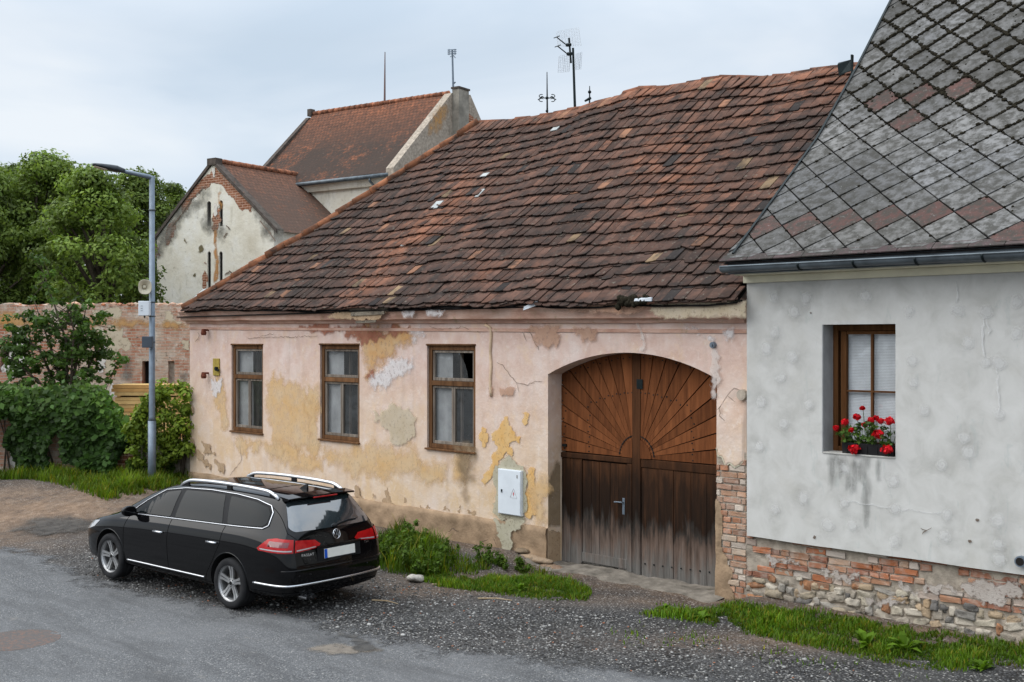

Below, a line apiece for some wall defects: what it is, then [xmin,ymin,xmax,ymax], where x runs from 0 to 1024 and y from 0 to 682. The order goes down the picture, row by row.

spalling [155,168,252,258]
spalling [190,438,225,474]
peeling [478,412,529,484]
peeling [524,467,537,519]
flaking render [715,450,1024,613]